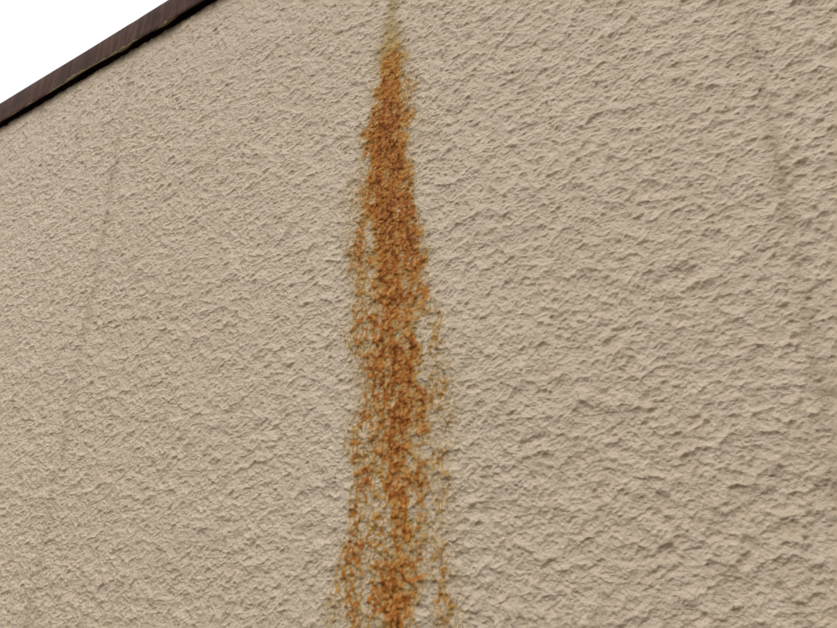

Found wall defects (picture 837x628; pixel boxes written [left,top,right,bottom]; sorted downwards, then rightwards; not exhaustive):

rust [329,0,463,628]